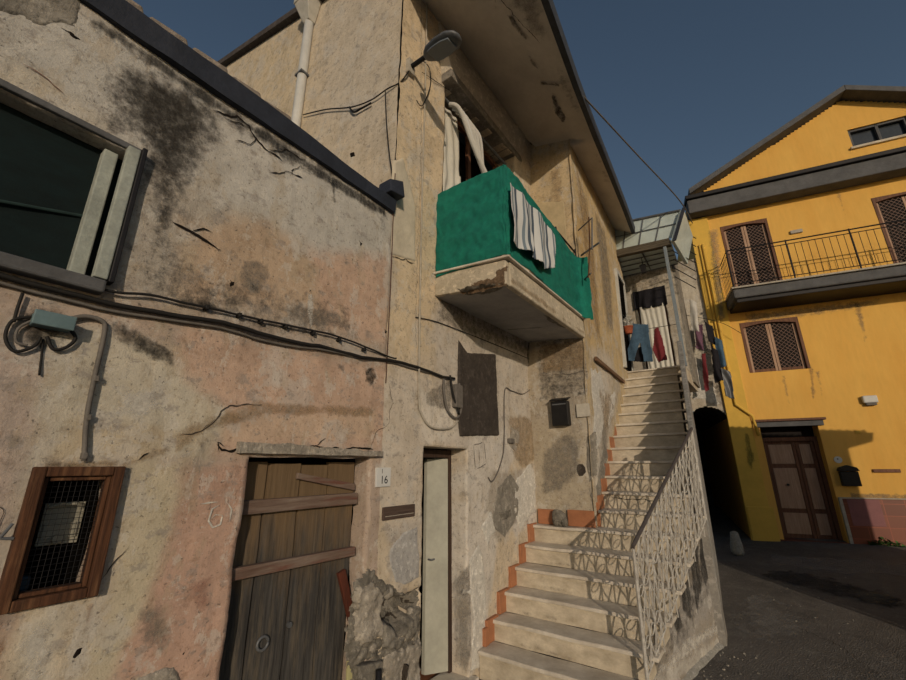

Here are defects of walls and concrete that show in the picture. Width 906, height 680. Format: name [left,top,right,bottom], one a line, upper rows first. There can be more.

damp [128,52,385,214]
crack [217,111,304,178]
crack [173,222,220,250]
spalling [457,266,508,295]
crack [181,403,262,453]
crack [311,385,393,450]
peeling [577,368,616,499]
spalling [344,527,422,680]
damp [675,539,708,630]
flaking render [137,667,179,680]